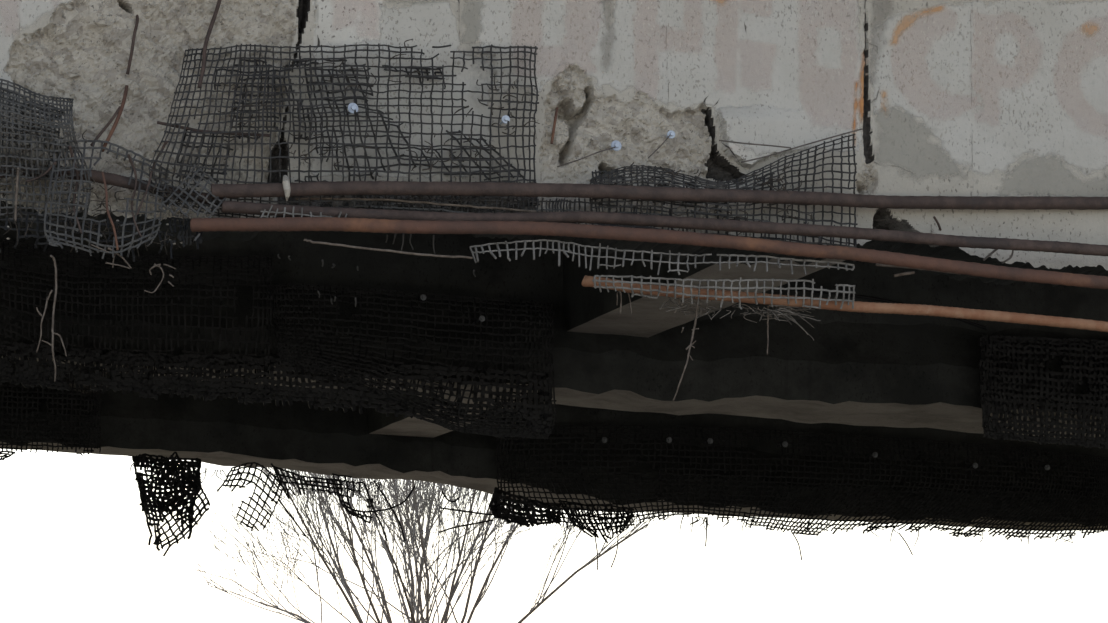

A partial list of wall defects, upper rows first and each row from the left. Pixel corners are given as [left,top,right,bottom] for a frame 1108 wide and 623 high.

crack [267,0,320,183]
spalling [0,0,725,234]
peeling [309,0,1108,195]
crack [857,0,916,175]
spalling [873,208,939,247]